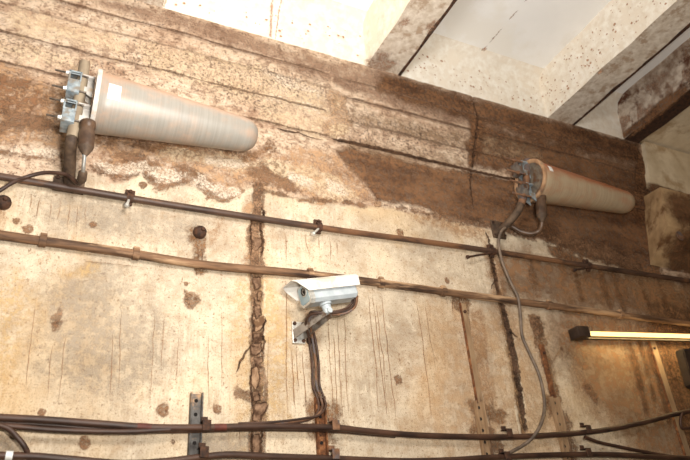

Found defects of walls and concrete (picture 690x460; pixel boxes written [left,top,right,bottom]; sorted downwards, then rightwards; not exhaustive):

leakage [0,8,128,160]
corrosion [190,228,207,274]
crack [249,206,265,254]
leakage [91,3,690,321]
crack [278,97,513,204]
crack [236,276,268,453]
crack [485,232,528,434]
corrosion [528,314,580,460]